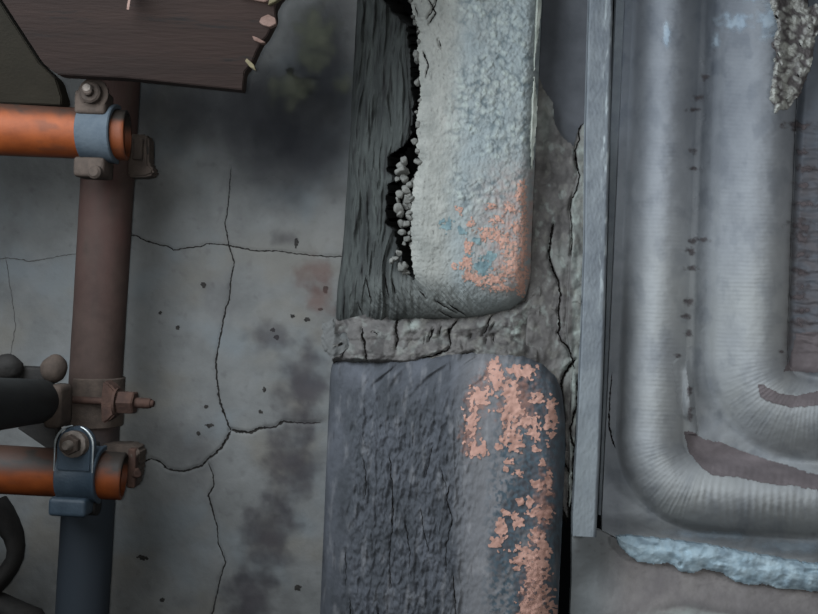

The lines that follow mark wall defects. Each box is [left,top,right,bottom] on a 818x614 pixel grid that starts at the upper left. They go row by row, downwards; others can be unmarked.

spalling [769,0,818,114]
spalling [389,138,422,275]
crack [1,254,72,354]
crack [342,276,411,359]
crack [418,291,495,360]
crack [548,124,583,524]
crack [131,170,342,614]
peeling [758,384,818,408]
peeling [684,431,818,491]